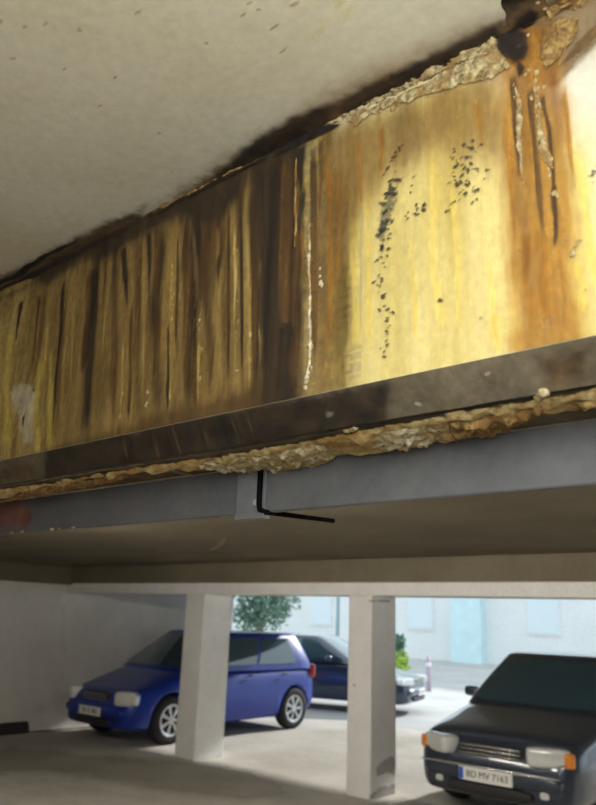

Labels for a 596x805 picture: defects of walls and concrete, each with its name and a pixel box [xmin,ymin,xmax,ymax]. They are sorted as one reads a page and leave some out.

water stain [0,0,596,460]
hole [496,0,540,77]
corrosion [500,25,582,352]